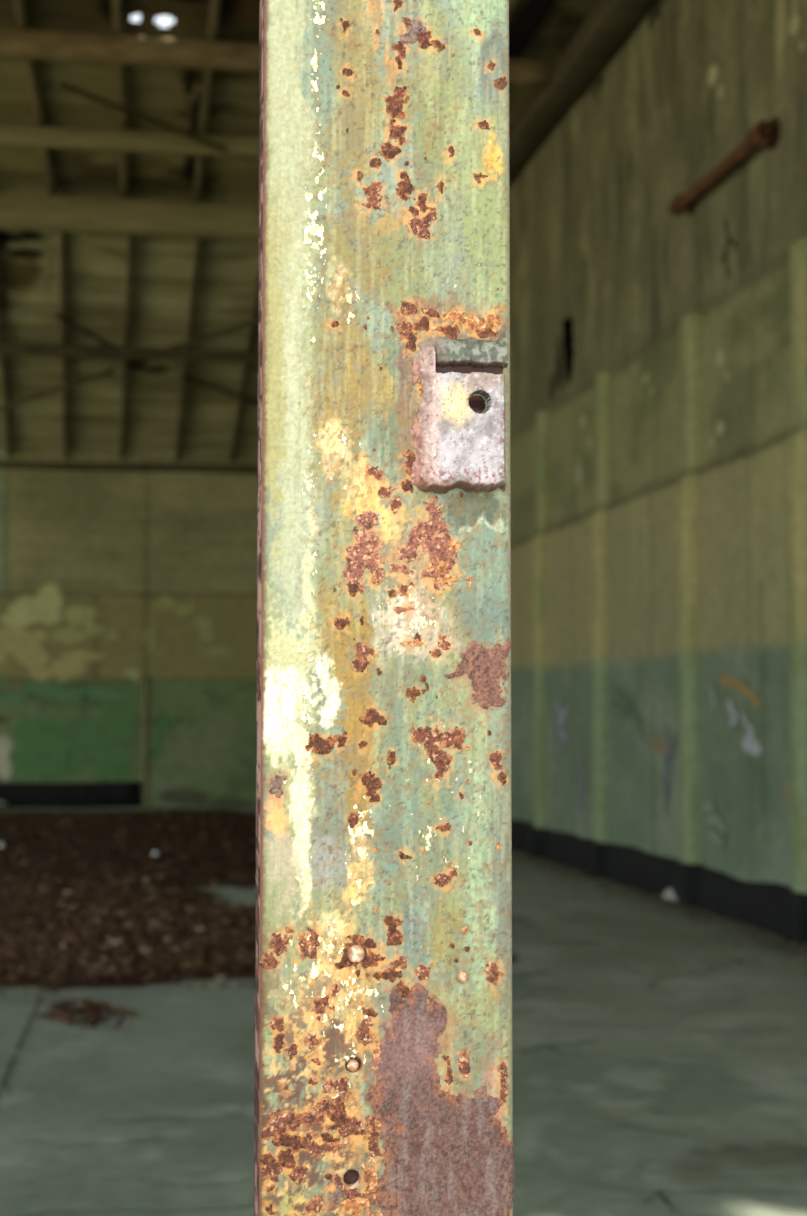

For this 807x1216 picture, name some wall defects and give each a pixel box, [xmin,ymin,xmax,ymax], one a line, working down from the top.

rust [393,0,455,69]
rust [357,86,444,239]
rust [390,301,501,352]
rust [333,437,473,614]
peeling [267,629,337,784]
rust [305,731,368,754]
rust [359,708,389,727]
rust [352,750,396,803]
rust [412,719,469,805]
rust [400,633,511,710]
peeling [292,797,315,896]
rust [258,907,515,1216]